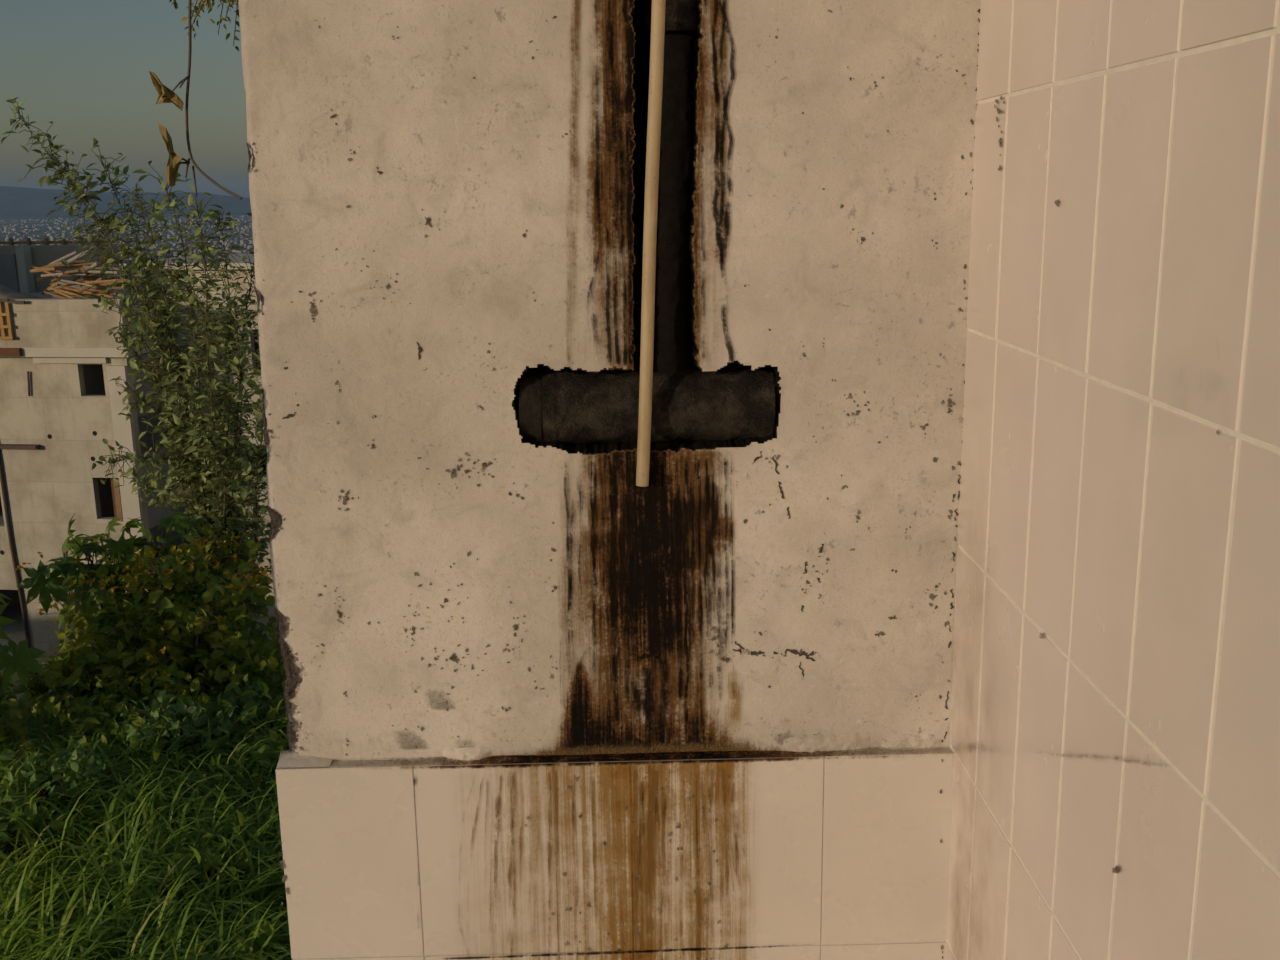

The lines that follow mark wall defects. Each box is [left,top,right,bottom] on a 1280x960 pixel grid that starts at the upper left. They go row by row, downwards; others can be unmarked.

spalling [267,506,286,541]
spalling [274,607,307,751]
corrosion [728,680,740,721]
corrosion [472,762,748,960]